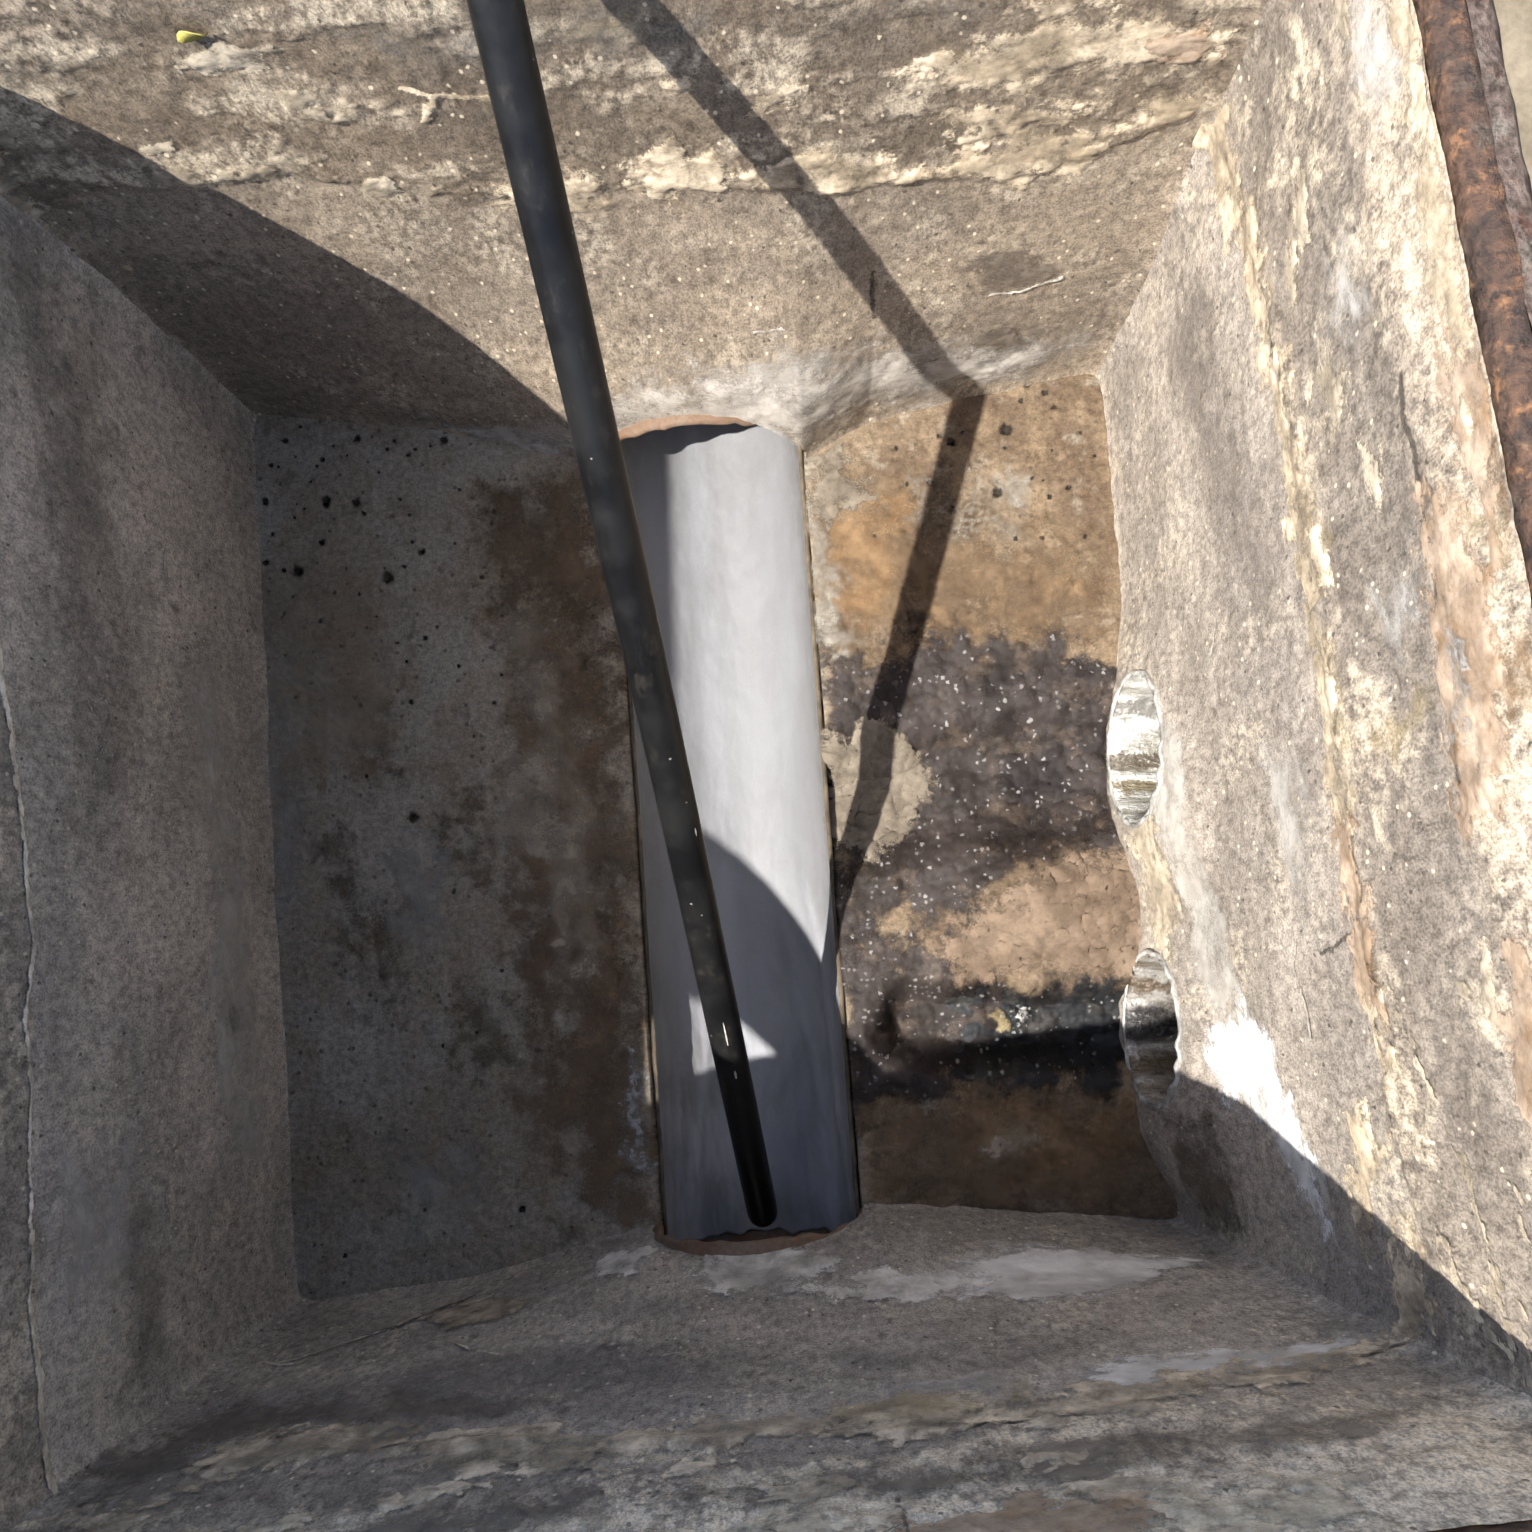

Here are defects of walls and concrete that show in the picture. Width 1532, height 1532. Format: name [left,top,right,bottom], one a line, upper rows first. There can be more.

corrosion [1507,637,1531,717]
leakage [1130,734,1223,962]
leakage [1272,767,1297,861]
crack [0,630,59,1496]
leakage [1173,964,1334,1243]